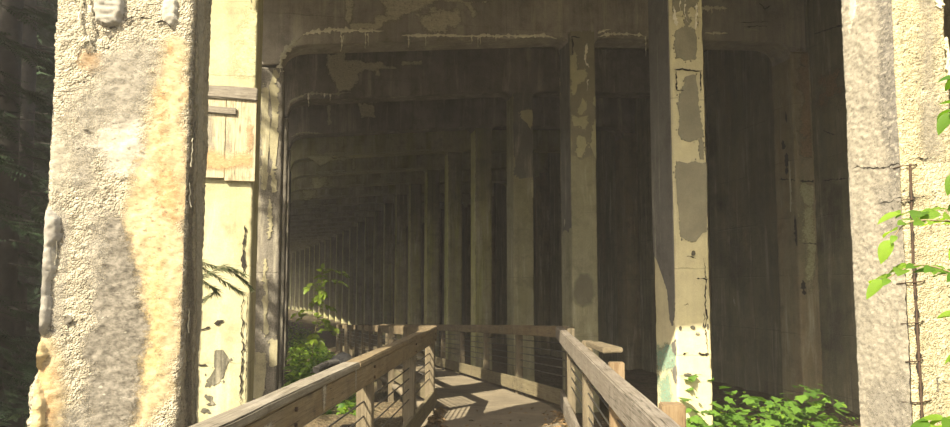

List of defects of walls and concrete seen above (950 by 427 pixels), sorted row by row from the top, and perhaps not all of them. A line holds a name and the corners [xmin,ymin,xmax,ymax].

leakage [74,0,93,55]
rust [122,38,189,427]
crack [201,226,248,404]
peeling [559,30,596,234]
peeling [648,0,709,384]